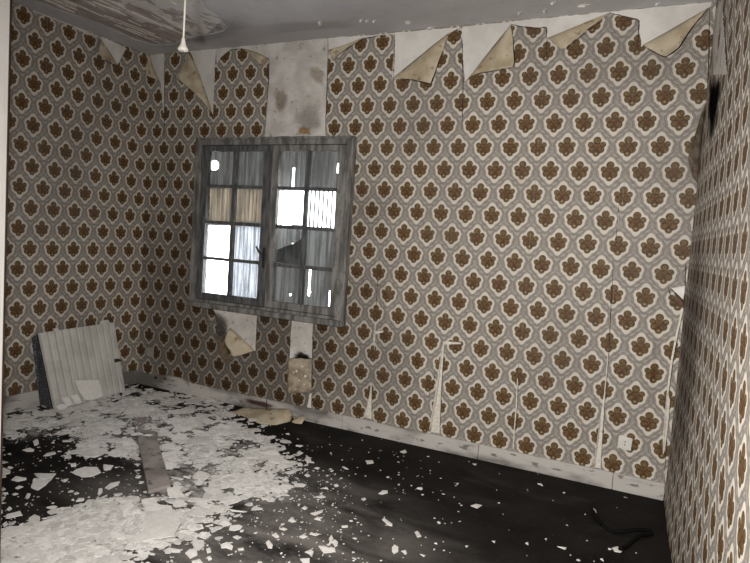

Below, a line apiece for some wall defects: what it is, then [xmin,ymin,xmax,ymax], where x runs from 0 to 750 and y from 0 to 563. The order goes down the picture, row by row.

flaking render [33,10,127,64]
flaking render [150,54,164,113]
flaking render [190,0,728,137]
damp [708,82,720,136]
flaking render [213,309,257,350]
flaking render [287,320,313,408]
flaking render [430,342,444,433]
flaking render [663,308,683,453]